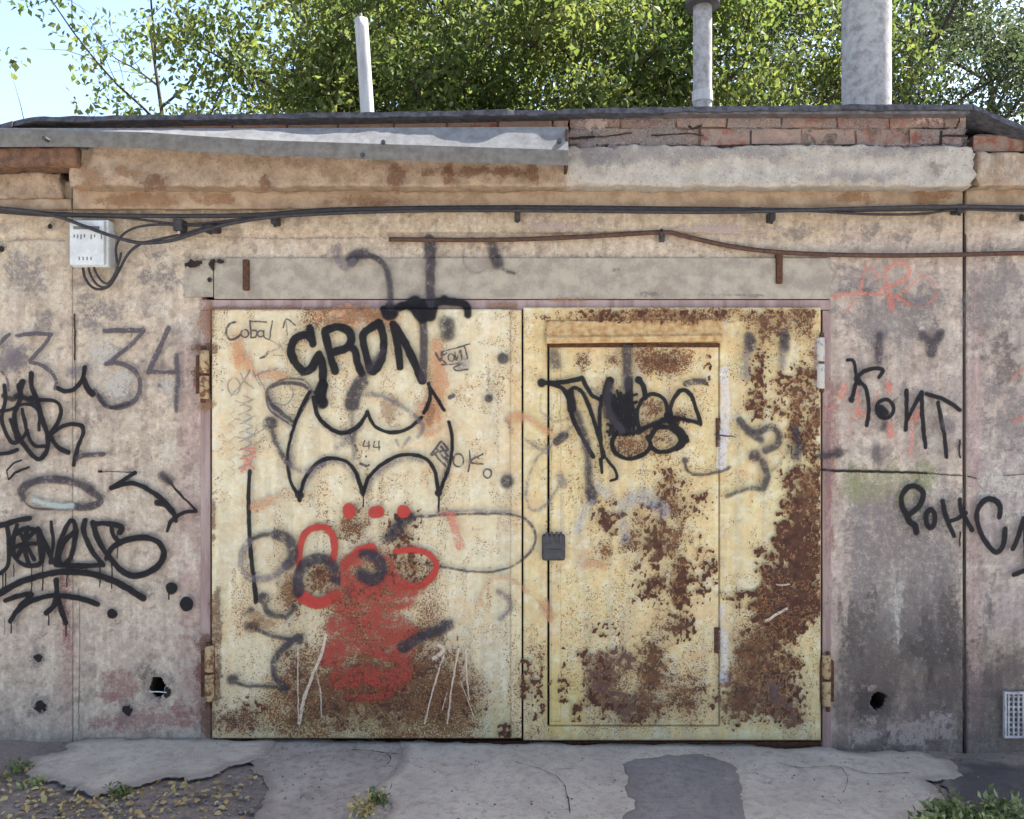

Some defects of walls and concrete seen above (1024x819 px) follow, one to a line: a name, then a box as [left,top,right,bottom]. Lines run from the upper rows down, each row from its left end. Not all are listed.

rust [274,499,429,626]
rust [194,587,513,739]
rust [495,309,821,738]
damp [884,561,907,653]